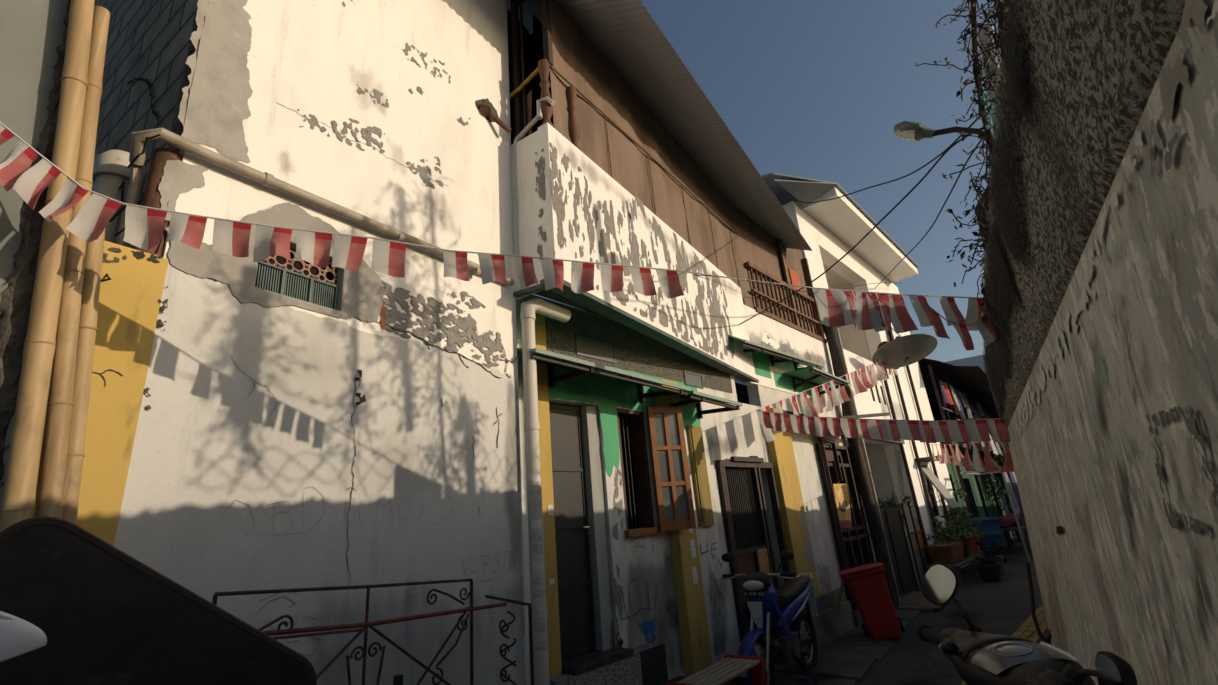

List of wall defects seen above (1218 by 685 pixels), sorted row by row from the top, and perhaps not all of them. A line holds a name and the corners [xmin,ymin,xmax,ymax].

spalling [31,0,71,167]
flaking render [158,160,208,221]
flaking render [178,0,253,163]
peeling [297,109,385,153]
peeling [357,85,389,107]
peeling [406,157,443,189]
peeling [403,43,451,83]
peeling [535,142,735,360]
spalling [0,185,49,482]
peeling [381,280,508,368]
crack [231,356,277,415]
crack [346,373,361,597]